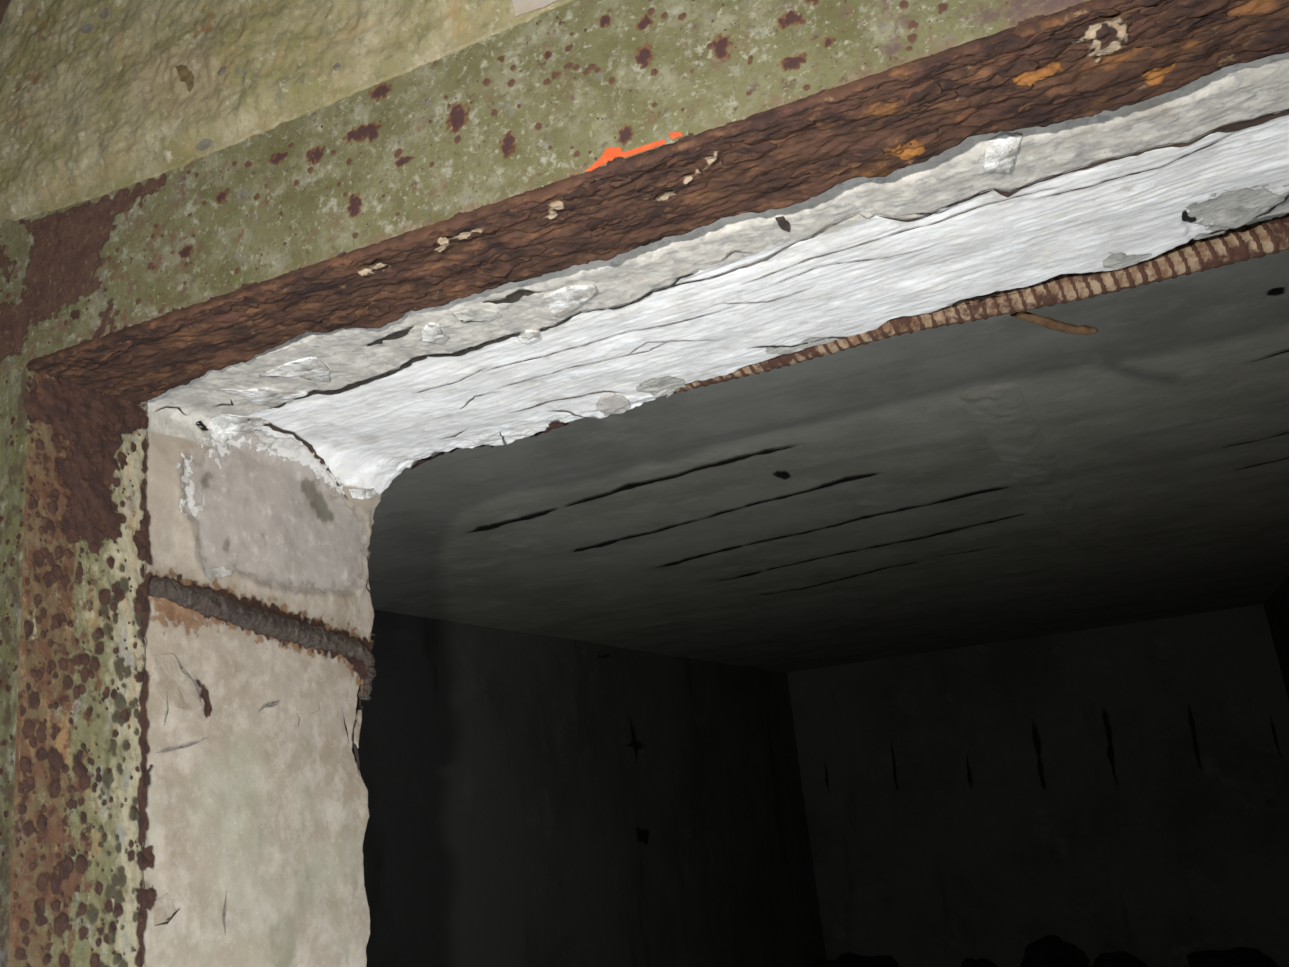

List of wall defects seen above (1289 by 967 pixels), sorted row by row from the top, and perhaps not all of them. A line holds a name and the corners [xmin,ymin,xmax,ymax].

flaking render [512,0,558,17]
corrosion [635,0,694,75]
corrosion [706,20,753,64]
corrosion [781,53,806,71]
corrosion [899,0,1238,113]
flaking render [983,132,1023,174]
flaking render [542,283,597,316]
spalling [636,185,1289,398]
corrosion [0,83,826,967]
crack [468,445,797,533]
crack [573,473,880,552]
crack [656,487,1028,596]